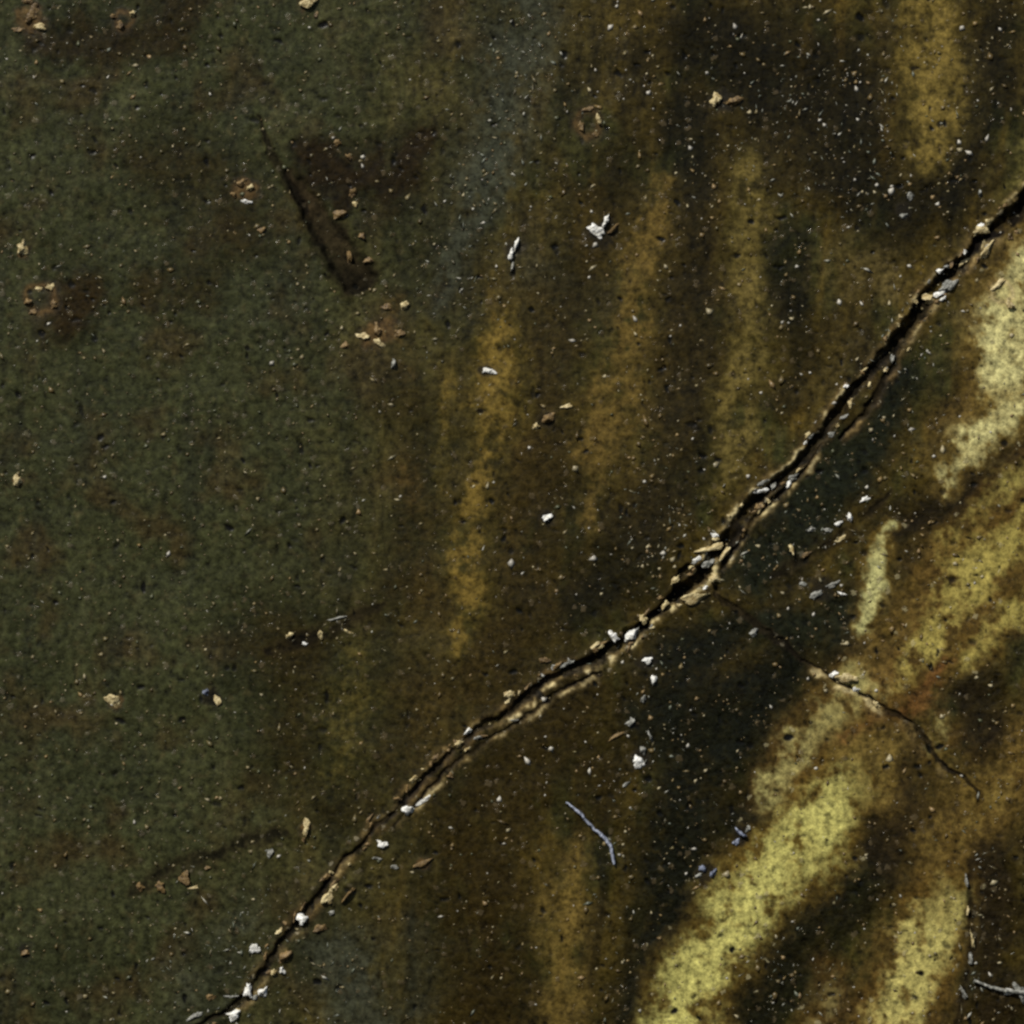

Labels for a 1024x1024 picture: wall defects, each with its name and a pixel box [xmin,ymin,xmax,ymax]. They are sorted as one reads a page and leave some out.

water stain [860,0,1024,259]
water stain [134,871,285,1024]
crack [186,178,1024,1024]
water stain [212,214,1024,1024]